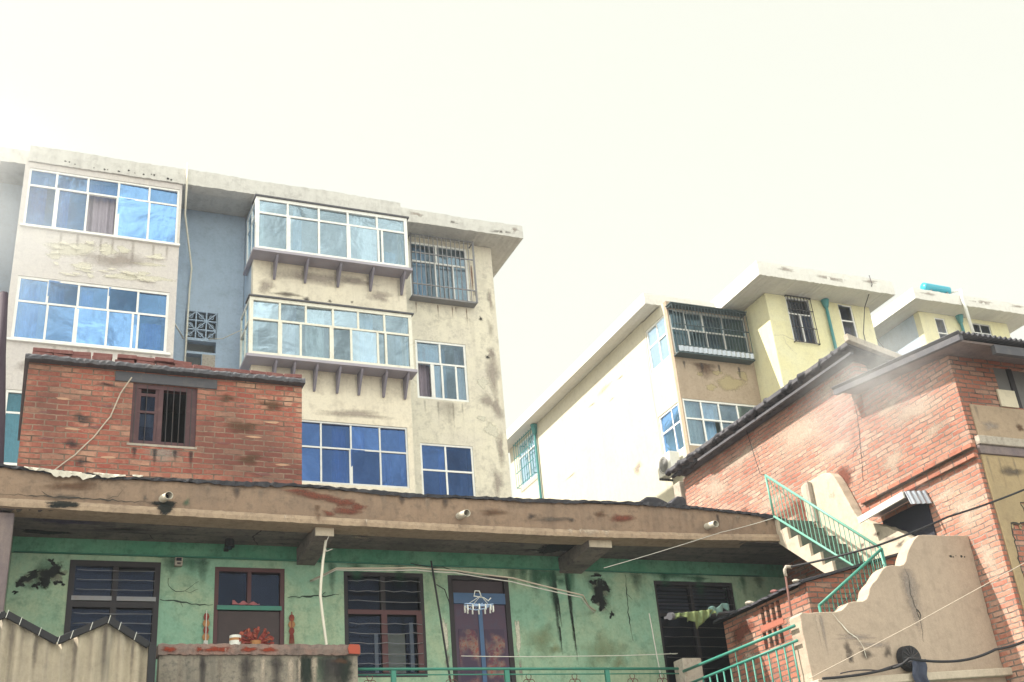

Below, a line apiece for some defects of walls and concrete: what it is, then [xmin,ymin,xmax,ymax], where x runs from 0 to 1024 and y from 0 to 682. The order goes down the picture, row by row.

peeling [46,241,171,282]
crack [852,397,865,478]
water stain [144,497,193,527]
flaking render [286,489,364,515]
peeling [12,559,65,594]
crack [160,578,206,606]
water stain [510,570,577,649]
peeling [589,573,614,619]
crack [906,572,924,642]